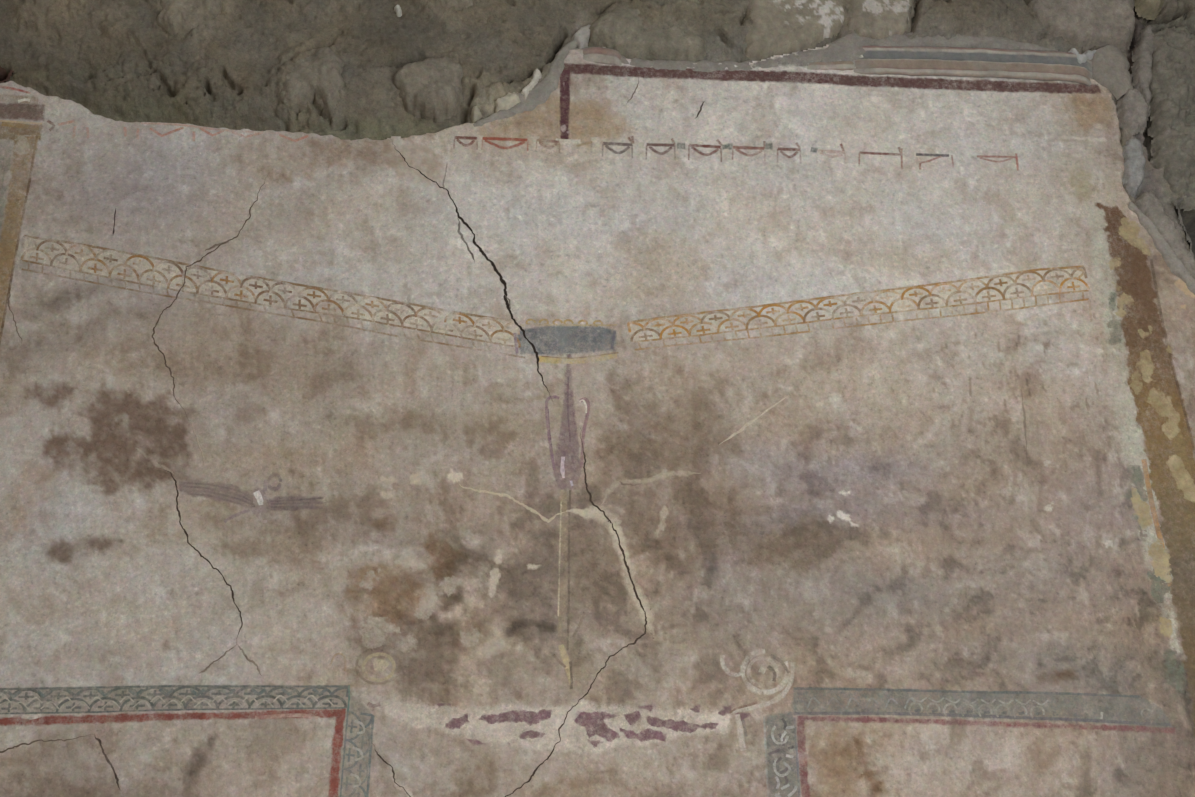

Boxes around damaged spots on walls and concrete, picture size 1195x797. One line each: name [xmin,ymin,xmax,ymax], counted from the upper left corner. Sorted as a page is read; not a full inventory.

spalling [0,0,1195,295]
leakage [0,369,208,569]
crack [135,447,262,676]
crack [152,173,269,467]
leakage [183,502,353,589]
crack [392,143,553,401]
crack [457,428,701,797]
peeling [1106,255,1135,319]
peeling [1130,487,1172,584]
peeling [1129,325,1195,503]
crack [0,734,124,795]
crack [372,743,414,797]